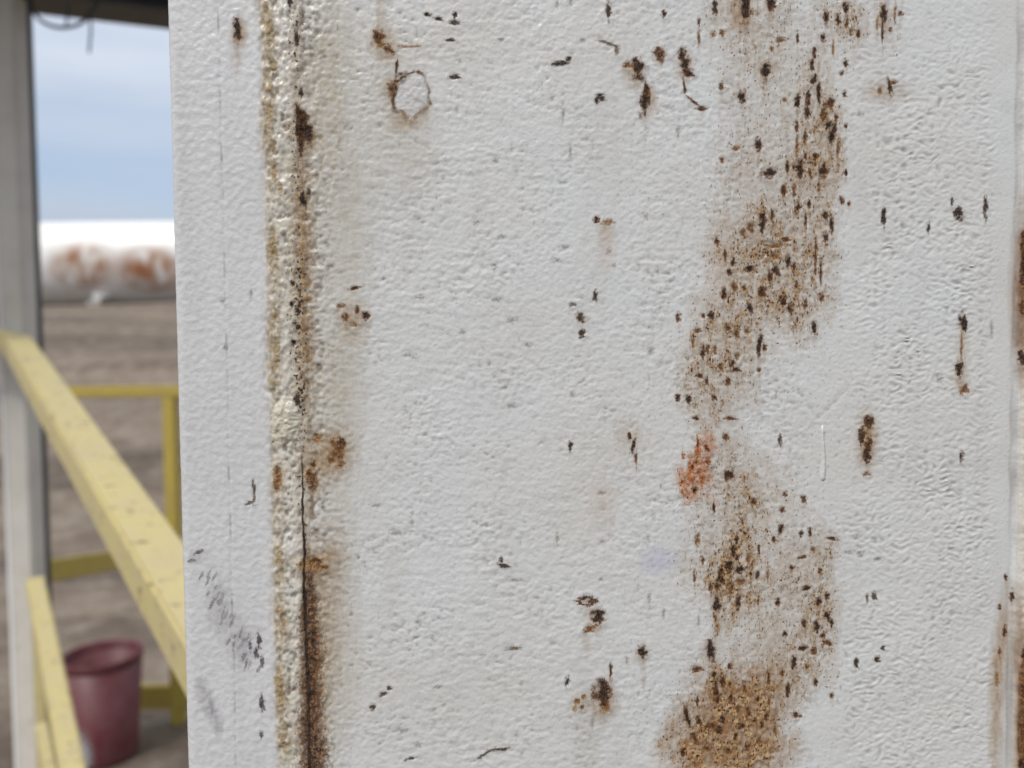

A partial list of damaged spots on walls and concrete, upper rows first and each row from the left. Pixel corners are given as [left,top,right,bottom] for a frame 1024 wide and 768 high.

rust [623,57,651,117]
rust [294,102,316,157]
rust [337,304,370,327]
rust [1016,231,1024,365]
rust [955,311,969,395]
rust [653,0,904,768]
rust [273,468,282,491]
rust [305,434,346,490]
crack [295,465,330,768]
rust [573,594,605,633]
rust [994,624,1007,686]
rust [572,664,613,712]